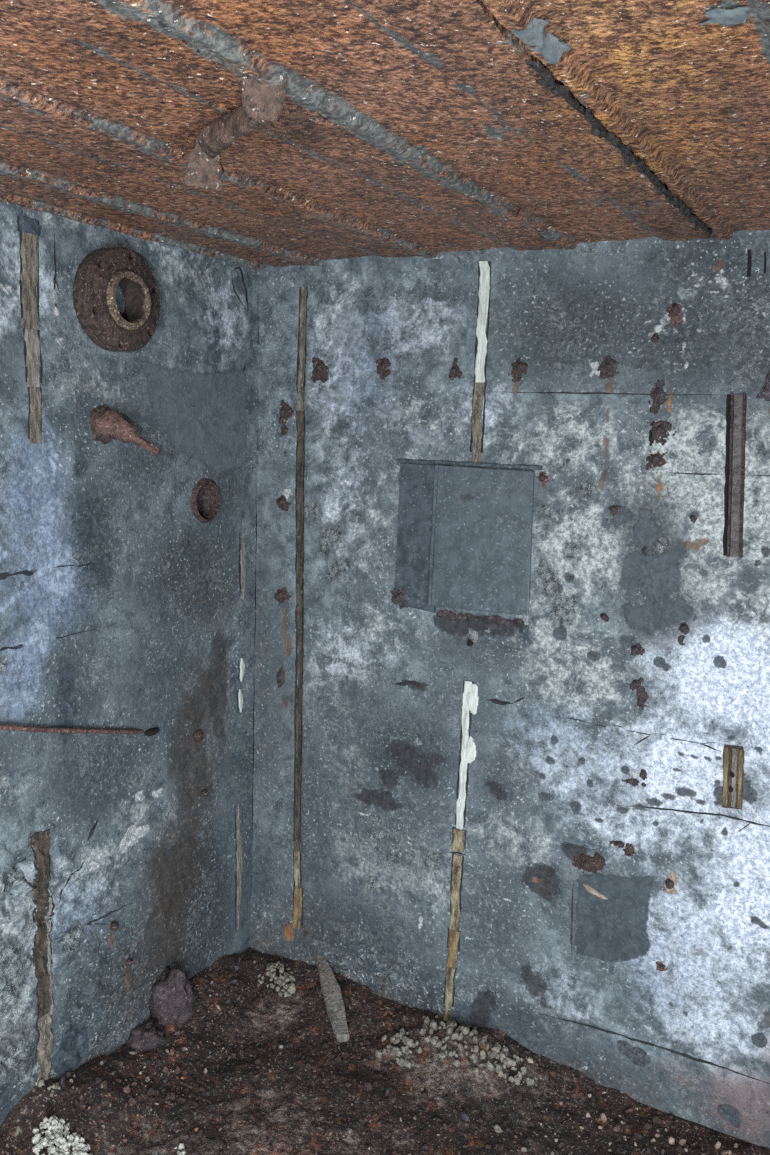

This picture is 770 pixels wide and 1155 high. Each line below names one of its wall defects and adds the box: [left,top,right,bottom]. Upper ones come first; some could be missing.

peeling [700,7,749,25]
peeling [511,17,571,64]
crack [0,562,95,580]
crack [0,629,94,651]